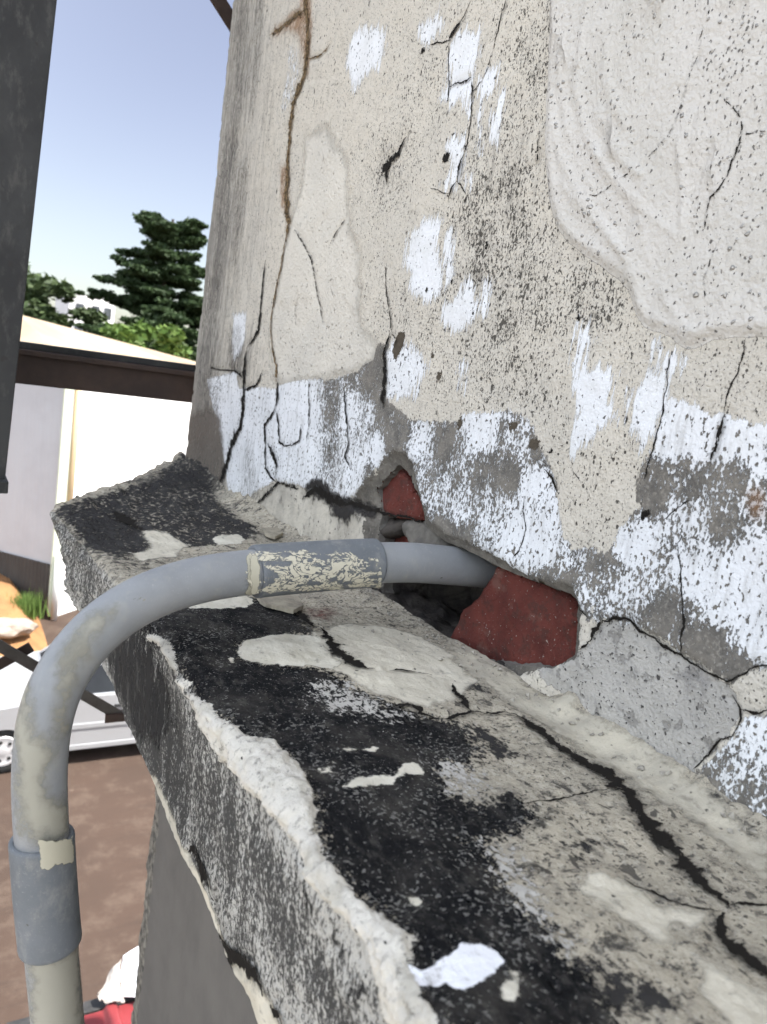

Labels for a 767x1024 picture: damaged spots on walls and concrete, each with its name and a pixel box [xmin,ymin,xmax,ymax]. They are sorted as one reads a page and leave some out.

crack [429,1,506,200]
crack [211,0,423,523]
crack [644,355,671,480]
crack [710,338,746,466]
peeling [207,312,767,816]
crack [577,500,767,768]
peeling [146,633,439,1024]
peeling [458,834,591,969]
crack [390,684,767,975]